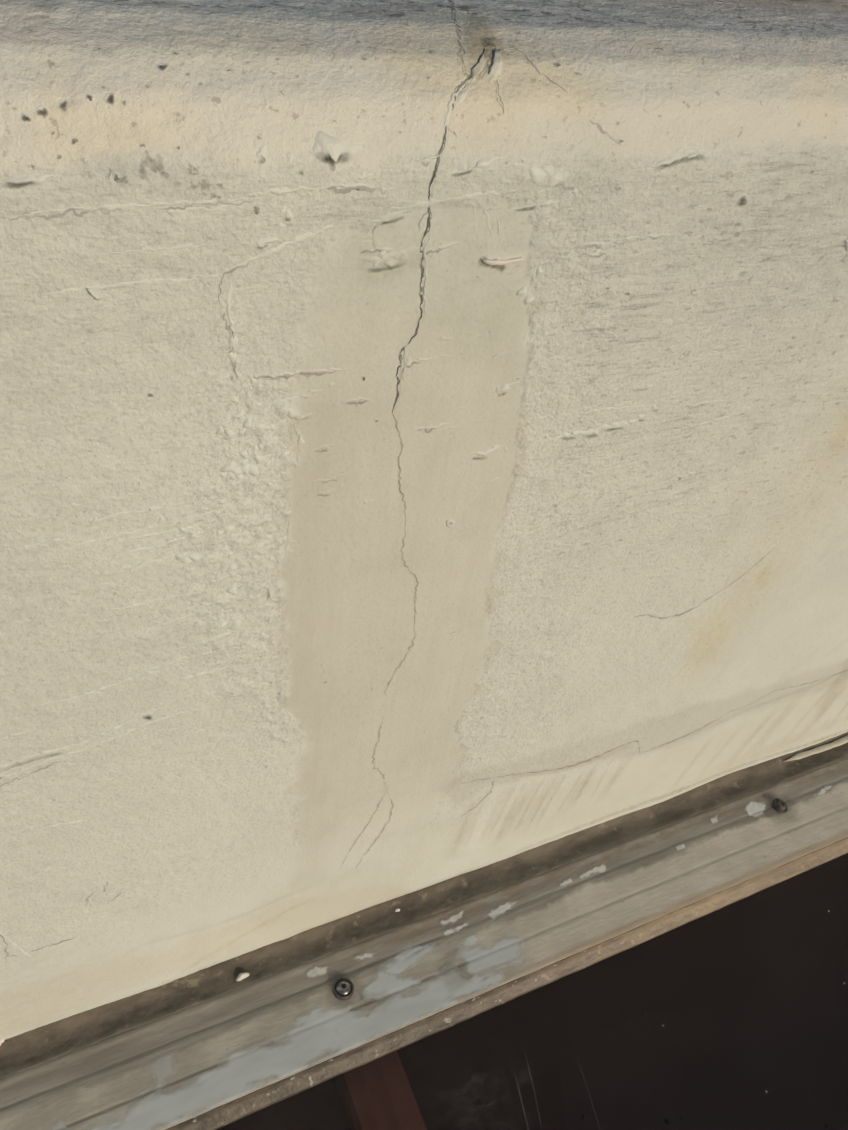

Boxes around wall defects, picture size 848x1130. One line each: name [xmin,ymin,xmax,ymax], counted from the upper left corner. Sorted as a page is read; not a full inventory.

crack [384,0,567,695]
crack [339,722,394,870]
crack [457,672,842,817]